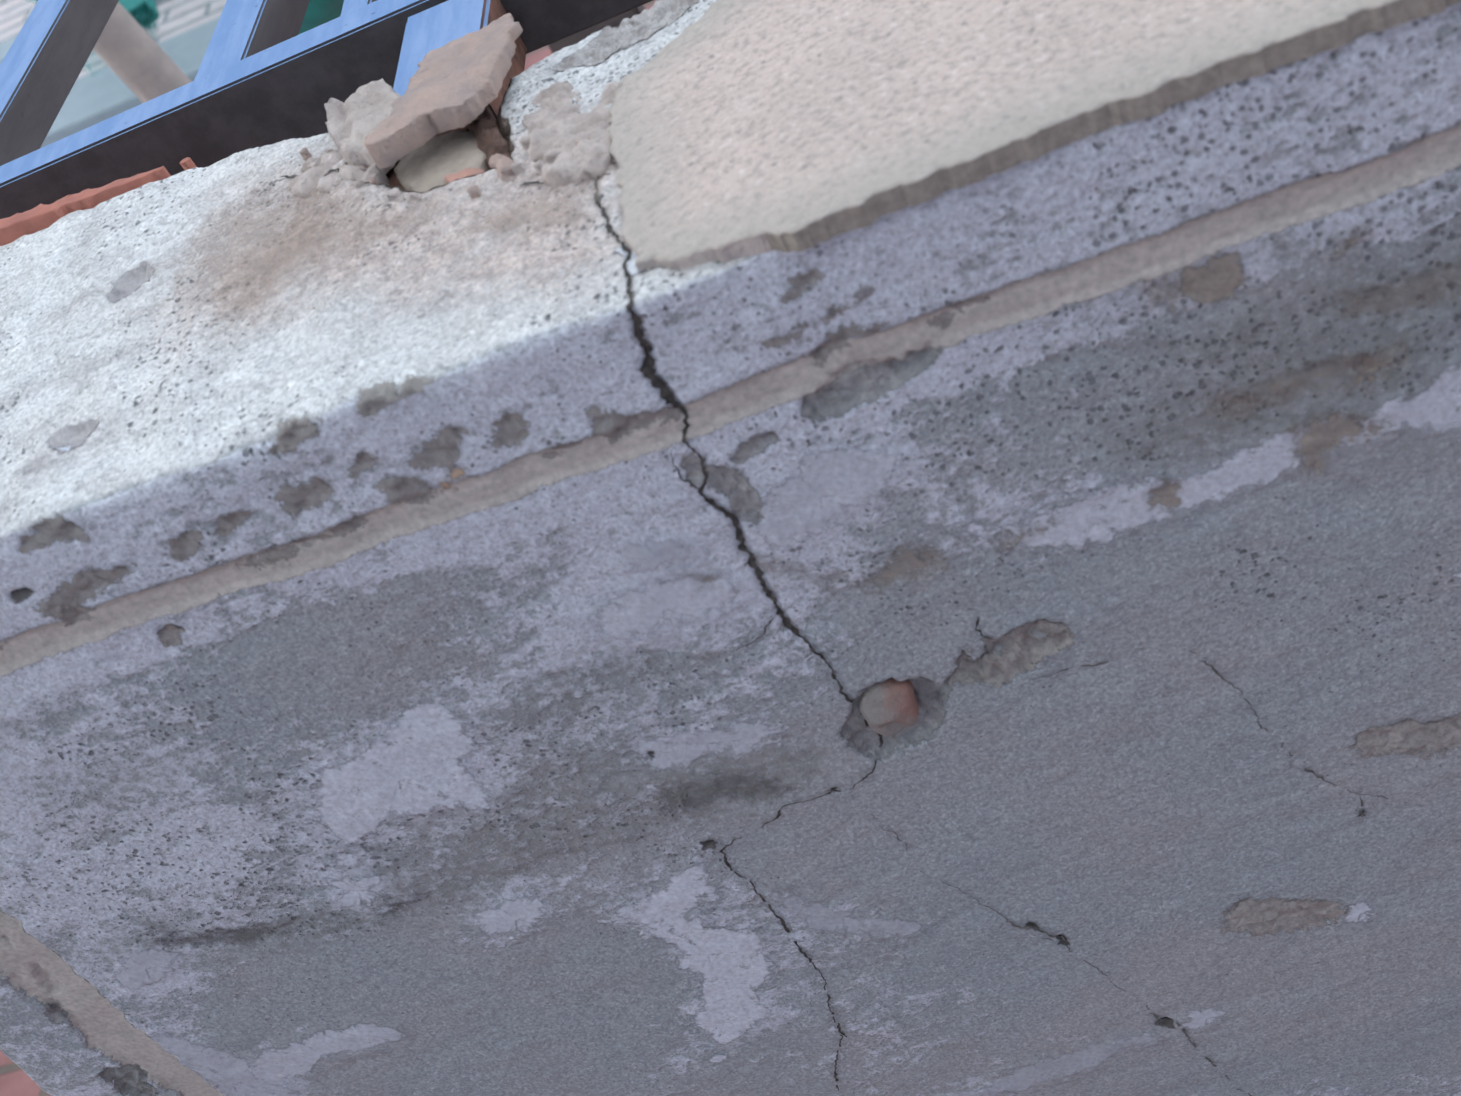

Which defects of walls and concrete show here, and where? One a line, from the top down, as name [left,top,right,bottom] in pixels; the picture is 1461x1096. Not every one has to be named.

spalling [345,79,514,193]
crack [594,176,1252,1096]
spalling [840,619,1075,761]
crack [1190,651,1420,818]
spalling [1220,895,1375,936]